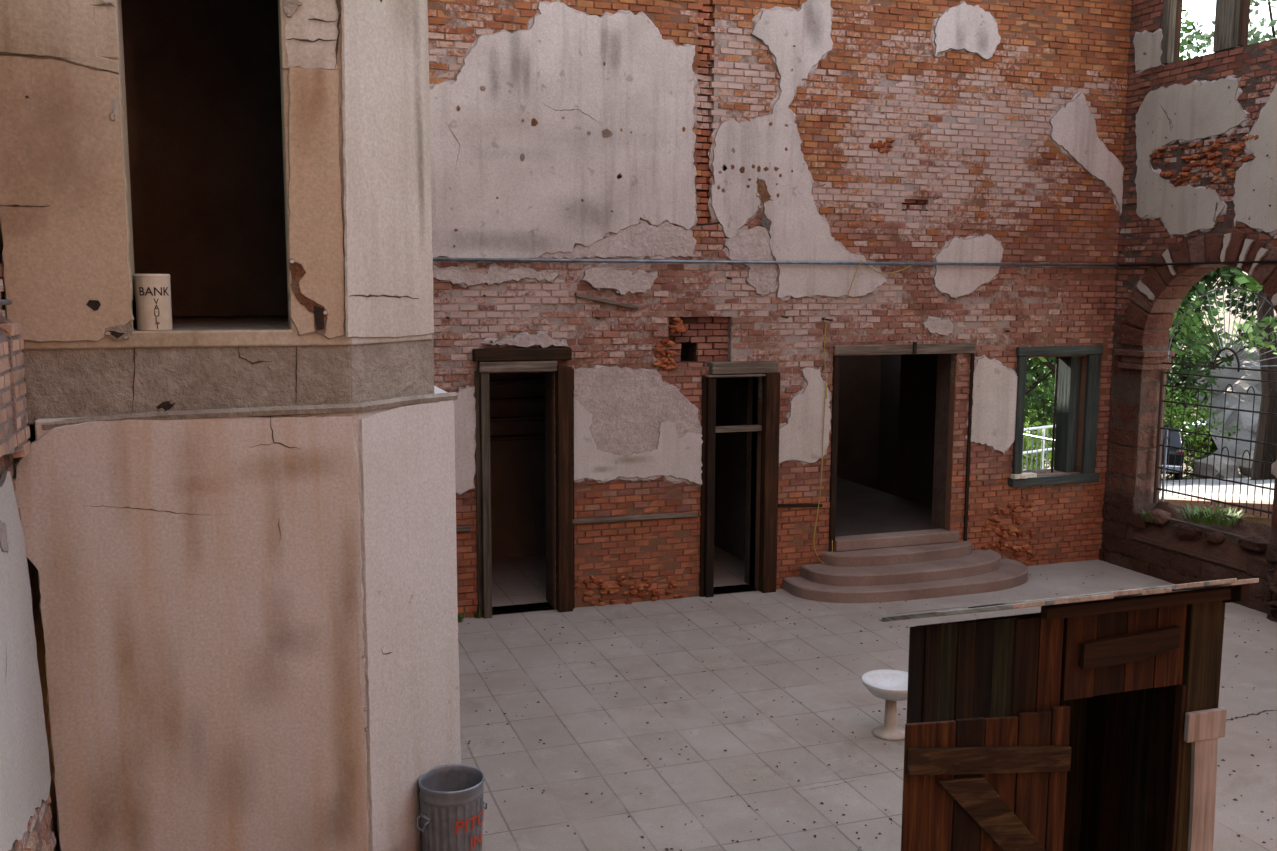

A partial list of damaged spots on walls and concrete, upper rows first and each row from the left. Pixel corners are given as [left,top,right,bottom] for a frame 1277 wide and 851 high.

crack [287,0,341,67]
flaking render [930,1,1001,61]
spalling [869,137,896,153]
spalling [1149,135,1259,187]
flaking render [930,233,1004,299]
flaking render [920,316,953,339]
spalling [573,575,683,606]